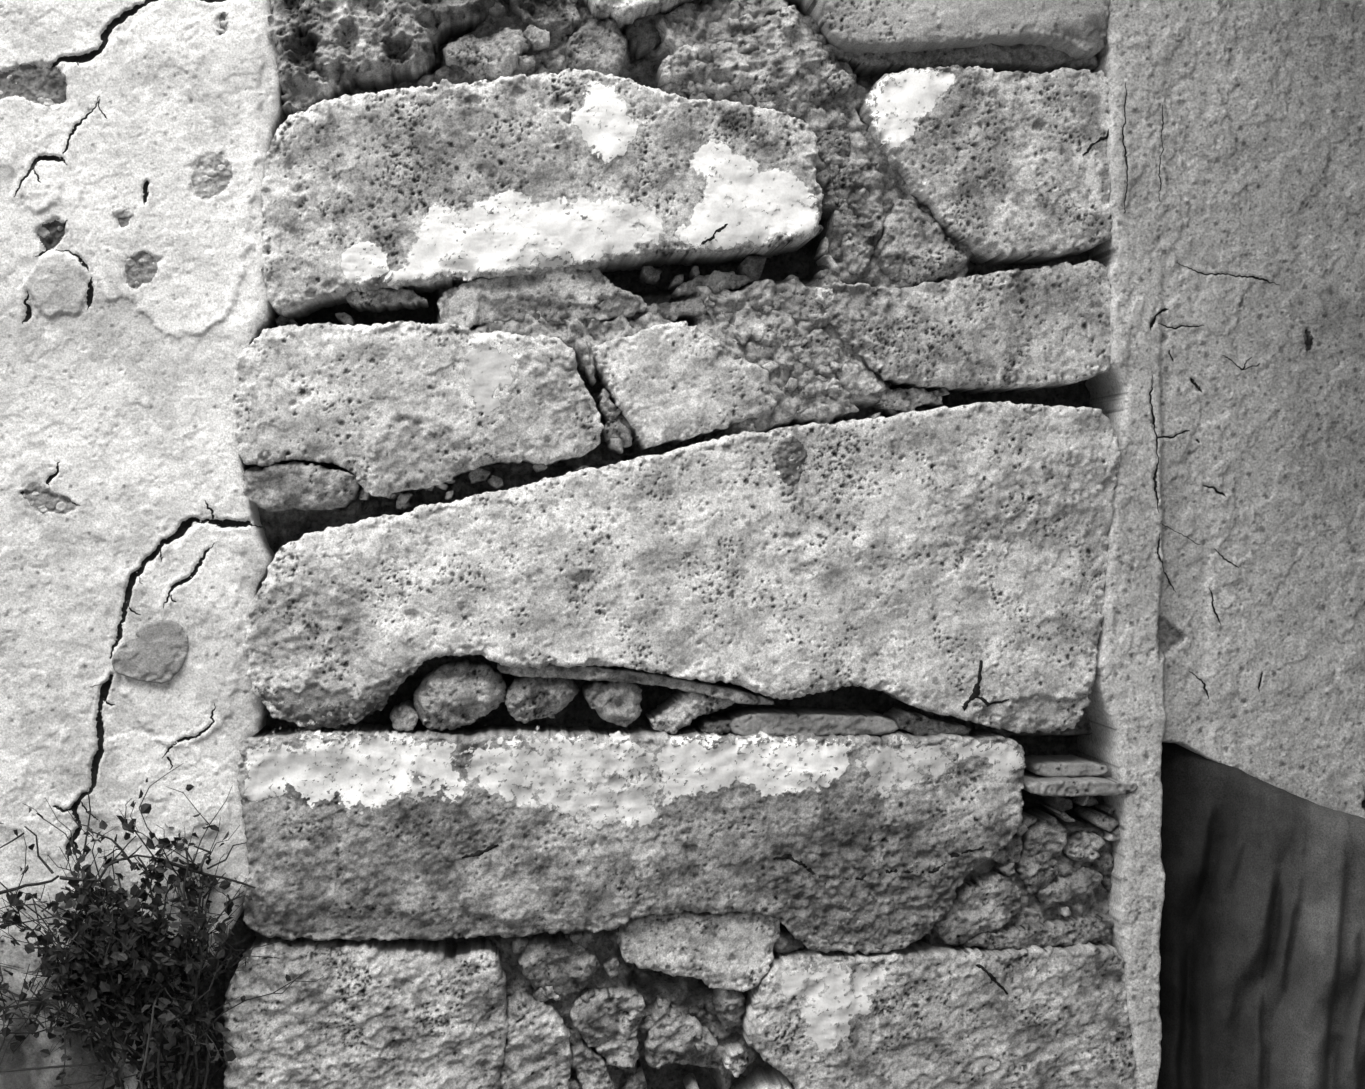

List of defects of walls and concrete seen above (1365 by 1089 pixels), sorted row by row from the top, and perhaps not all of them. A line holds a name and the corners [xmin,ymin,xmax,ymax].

crack [51,0,158,68]
flaking render [0,63,68,106]
crack [14,96,107,197]
crack [22,291,32,324]
crack [35,220,94,310]
crack [53,500,266,869]